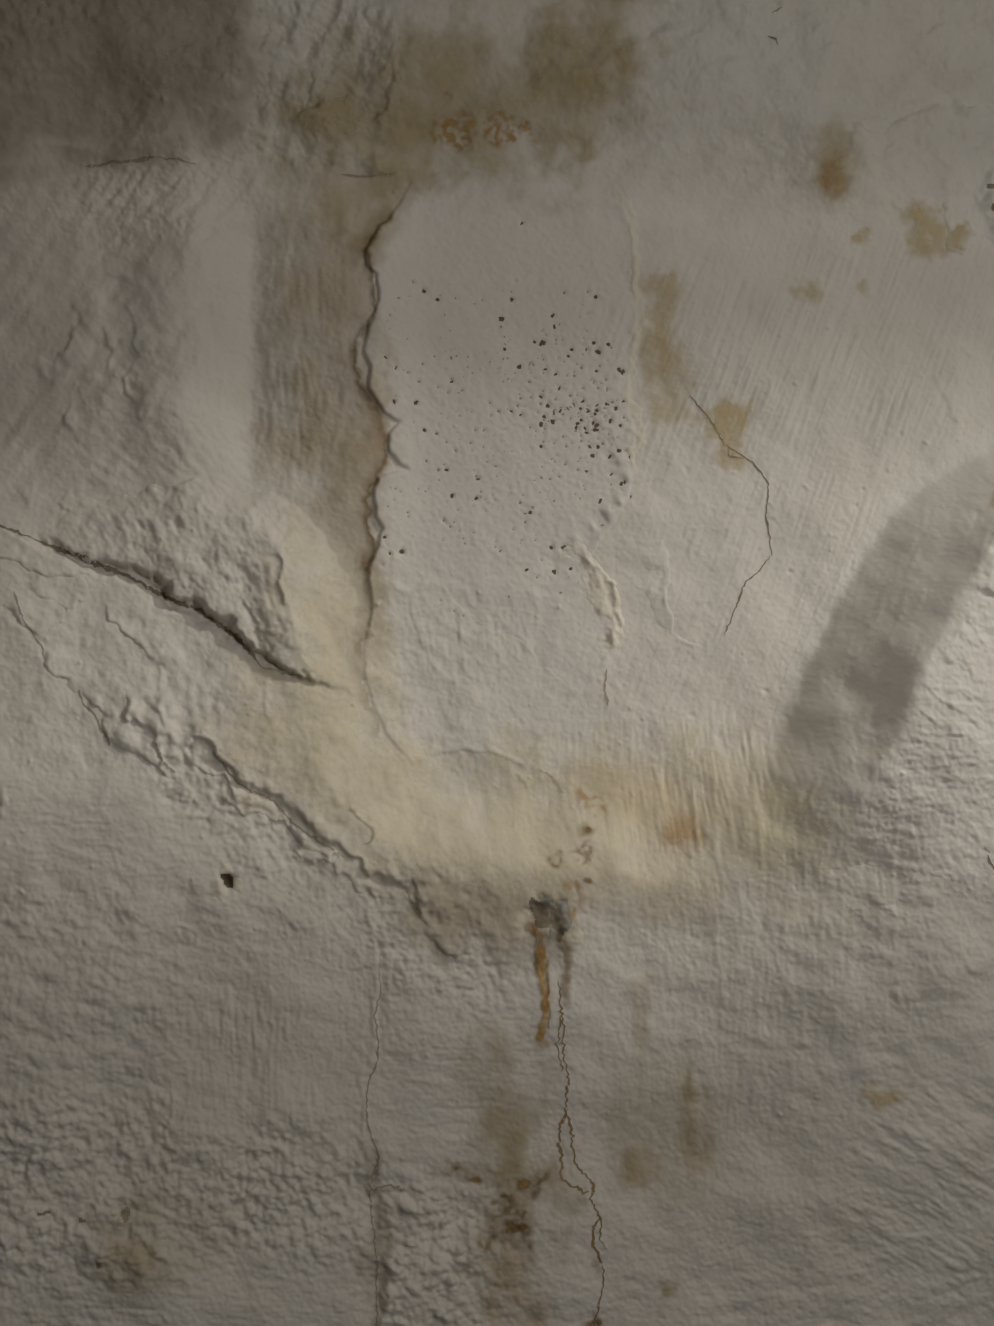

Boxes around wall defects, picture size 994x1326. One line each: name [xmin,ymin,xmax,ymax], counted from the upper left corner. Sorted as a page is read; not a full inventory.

damp [0,0,239,149]
crack [690,396,772,635]
damp [303,607,355,811]
damp [497,767,643,882]
damp [714,772,801,853]
rust [529,927,550,1041]
crack [555,981,605,1326]